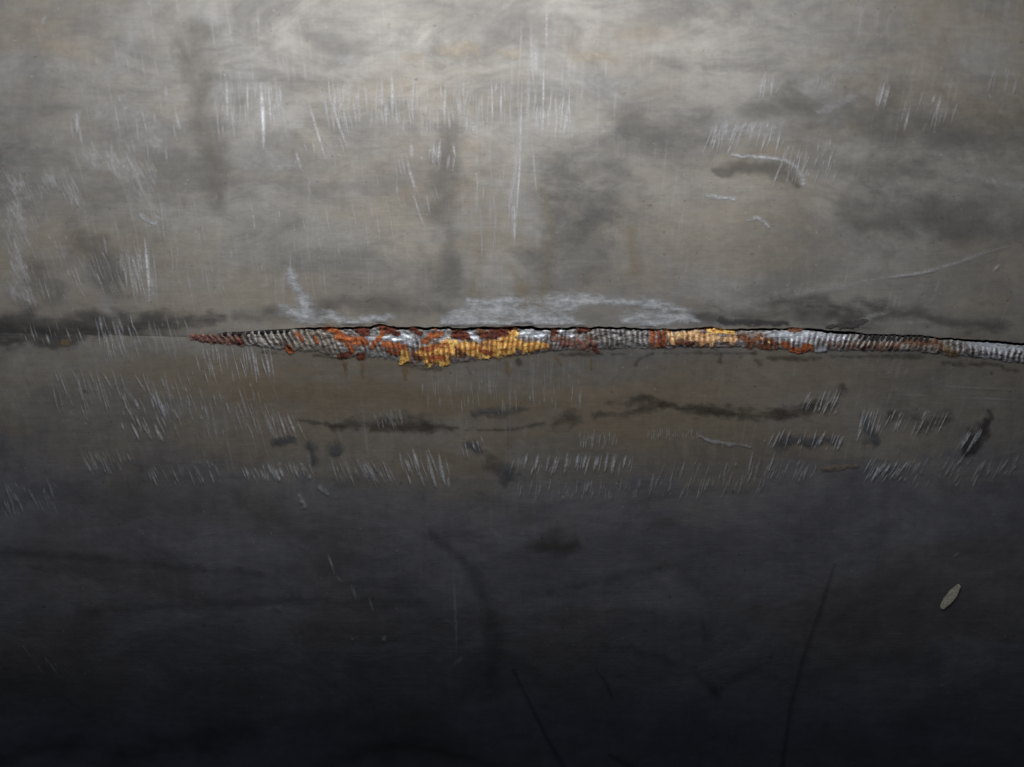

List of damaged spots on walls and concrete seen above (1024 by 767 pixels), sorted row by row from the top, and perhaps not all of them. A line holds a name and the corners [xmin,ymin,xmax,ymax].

leakage [282,269,391,325]
leakage [442,294,788,327]
leakage [0,312,223,349]
corrosion [286,325,599,379]
crack [223,319,1024,346]
corrosion [649,327,814,354]